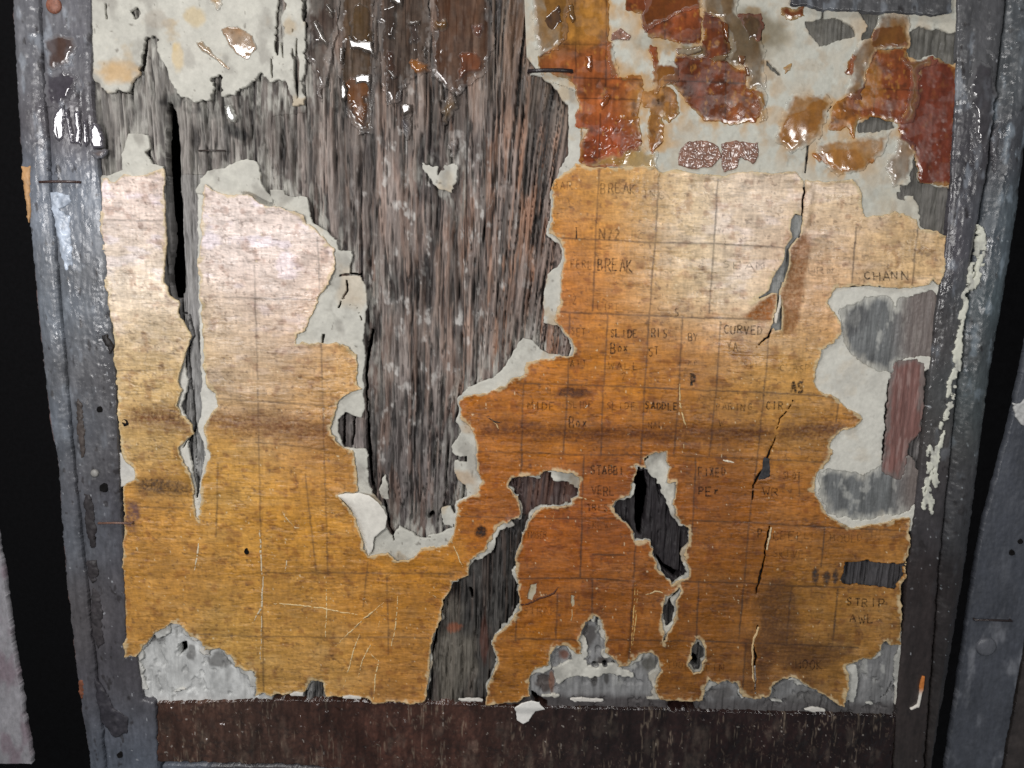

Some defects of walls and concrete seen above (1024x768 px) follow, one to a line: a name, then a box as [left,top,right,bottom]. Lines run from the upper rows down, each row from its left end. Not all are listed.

peeling [92,0,956,561]
crack [758,146,808,345]
crack [752,400,793,499]
peeling [426,471,580,702]
peeling [612,452,689,640]
crack [755,526,772,591]
peeling [138,623,274,702]
peeling [507,616,668,708]
crack [751,625,759,689]
peeling [688,632,902,715]